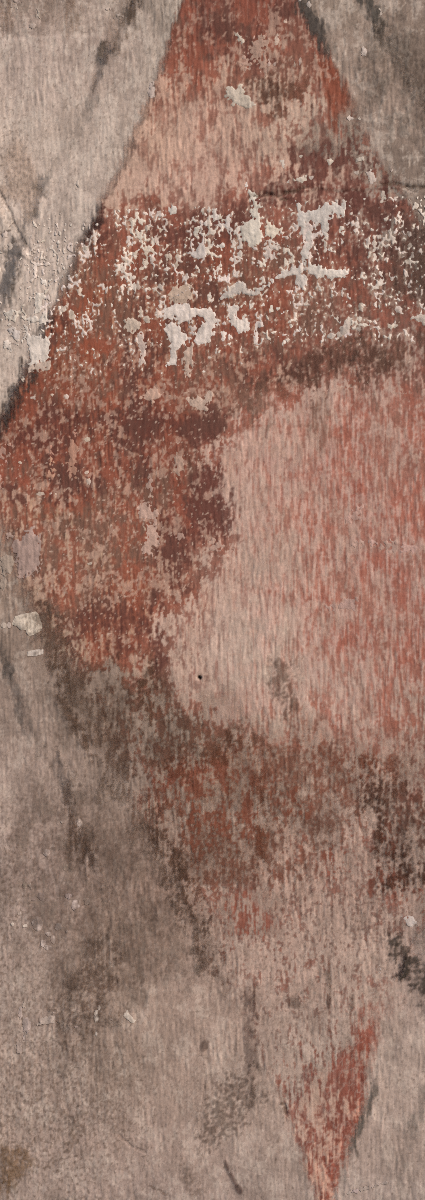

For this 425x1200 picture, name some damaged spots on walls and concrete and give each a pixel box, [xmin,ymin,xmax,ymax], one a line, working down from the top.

peeling [0,156,425,404]
spalling [1,611,42,636]
water stain [389,935,410,979]